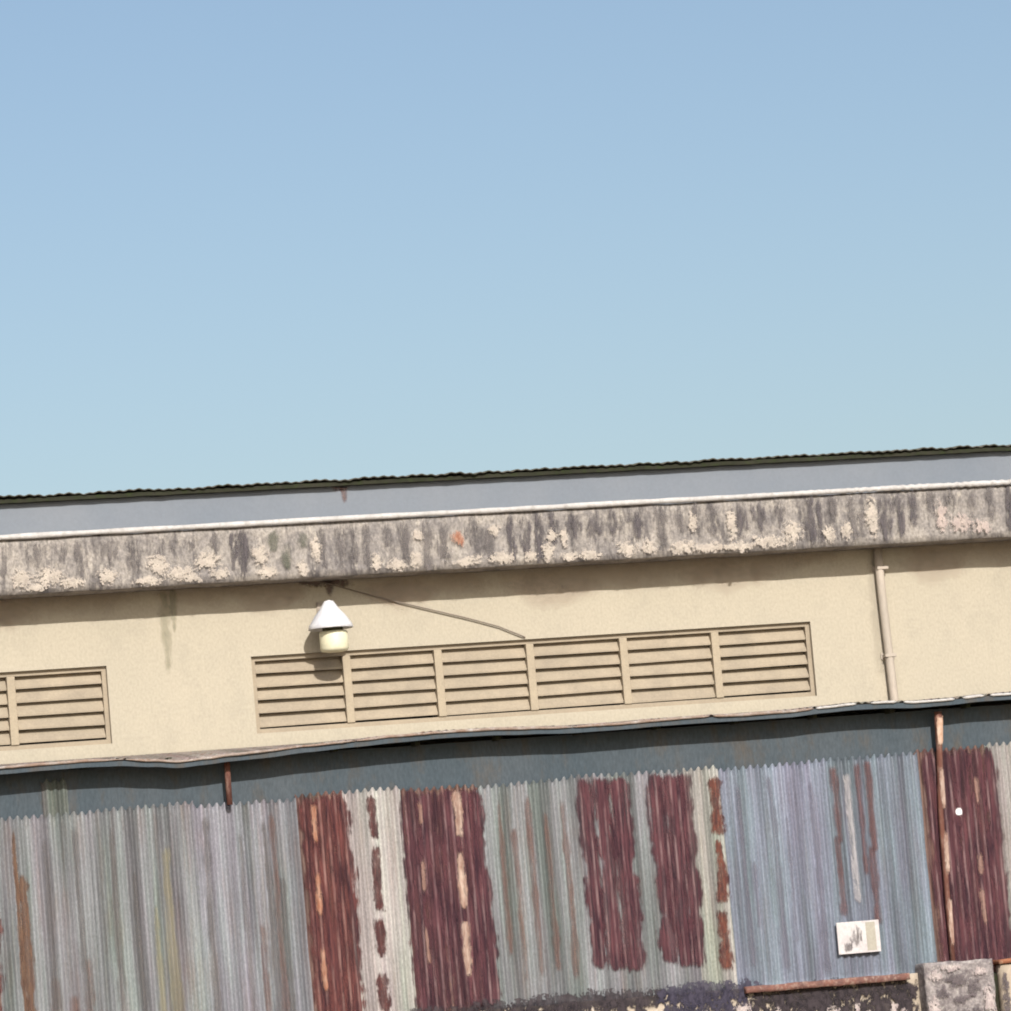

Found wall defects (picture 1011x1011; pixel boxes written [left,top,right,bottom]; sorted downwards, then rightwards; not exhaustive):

water stain [210,530,250,578]
water stain [299,524,372,594]
water stain [506,502,718,563]
water stain [731,498,786,538]
water stain [877,491,933,541]
corrosion [297,793,392,1011]
corrosion [399,788,534,1011]
corrosion [570,776,646,973]
water stain [410,948,920,1011]
corrosion [645,773,706,967]
corrosion [708,777,734,970]
corrosion [922,747,1011,968]